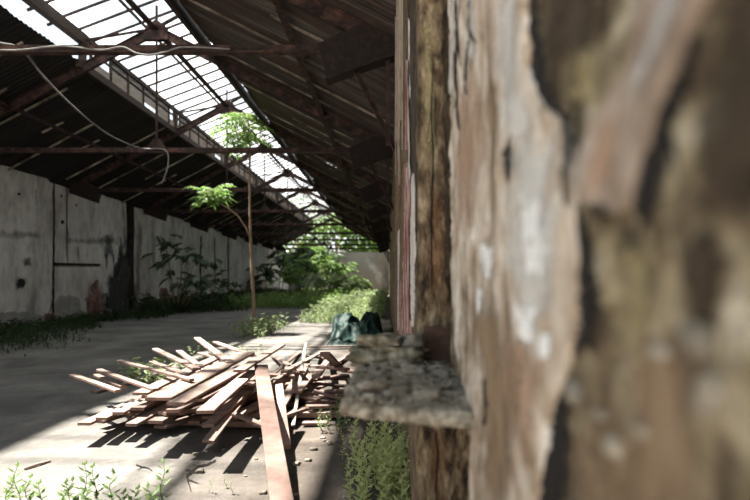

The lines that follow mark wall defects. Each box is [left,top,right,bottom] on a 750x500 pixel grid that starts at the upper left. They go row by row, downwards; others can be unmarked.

crack [453,0,476,130]
spalling [0,280,104,327]
leakage [102,236,136,316]